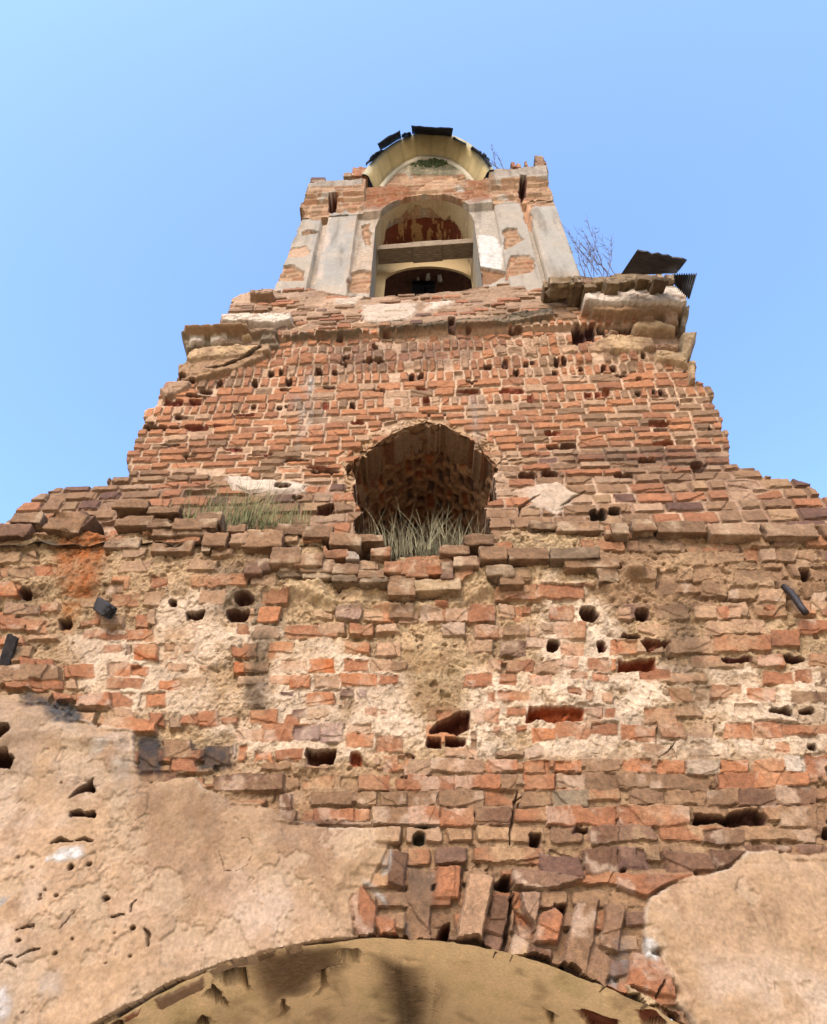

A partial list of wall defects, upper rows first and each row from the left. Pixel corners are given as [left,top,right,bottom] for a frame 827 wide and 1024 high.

spalling [361,206,463,246]
spalling [477,174,536,286]
spalling [579,604,601,623]
spalling [596,607,673,673]
spalling [425,709,472,749]
spalling [525,704,587,724]
damp [138,737,163,774]
damp [201,746,226,772]
crack [509,790,522,846]
spalling [691,807,770,828]
flaking render [0,694,393,1024]
flaking render [635,826,827,1024]